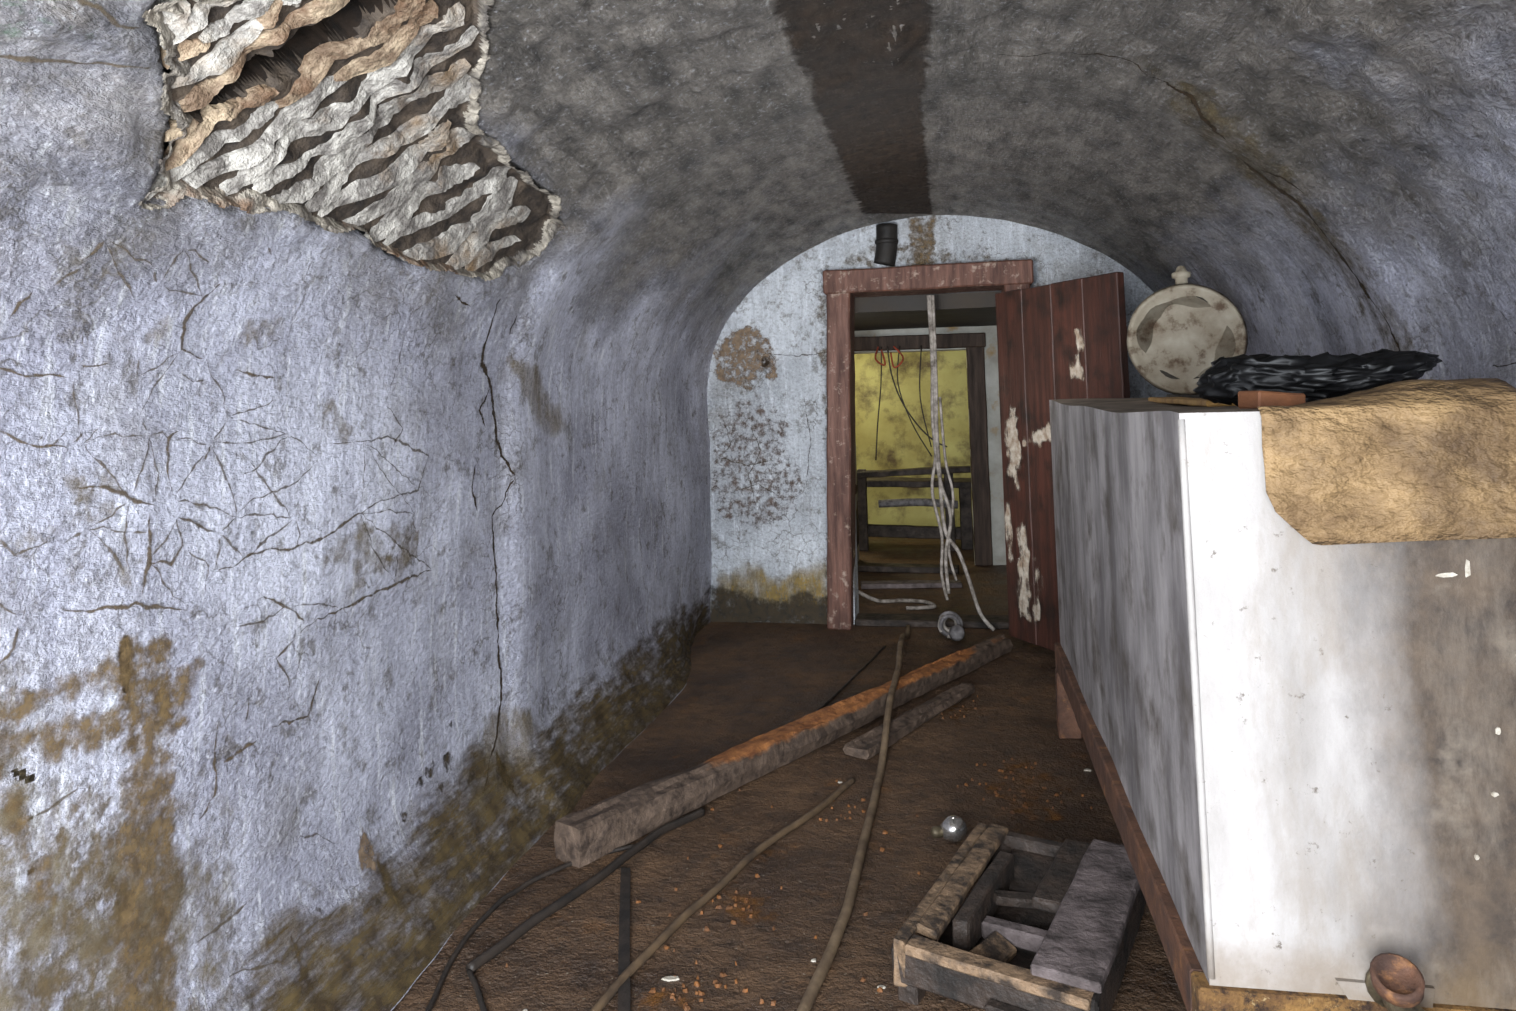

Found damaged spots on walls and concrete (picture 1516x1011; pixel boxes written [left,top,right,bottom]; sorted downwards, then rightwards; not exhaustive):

flaking render [138,0,566,281]
crack [0,241,431,819]
crack [455,295,517,786]
water stain [712,326,802,525]
water stain [0,637,228,1011]
crack [199,905,245,941]
crack [231,908,338,976]